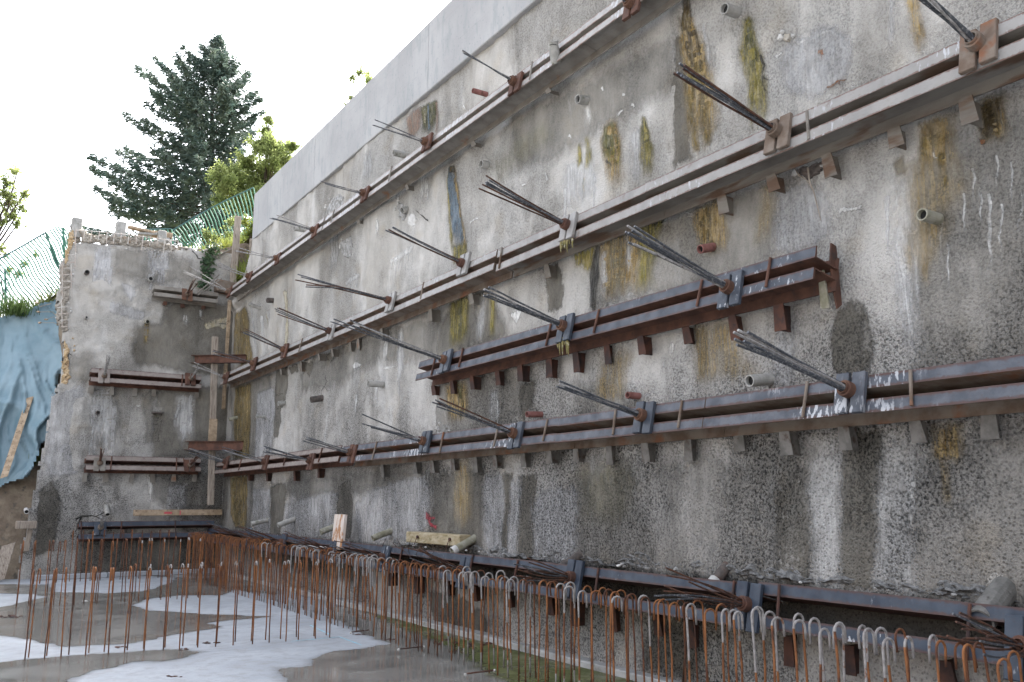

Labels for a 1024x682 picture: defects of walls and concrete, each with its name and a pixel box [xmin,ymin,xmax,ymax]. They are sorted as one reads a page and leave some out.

water stain [512,0,715,168]
spalling [55,229,179,384]
water stain [93,246,505,460]
water stain [447,166,467,258]
water stain [831,302,873,373]
water stain [886,120,1024,368]
water stain [34,352,117,555]